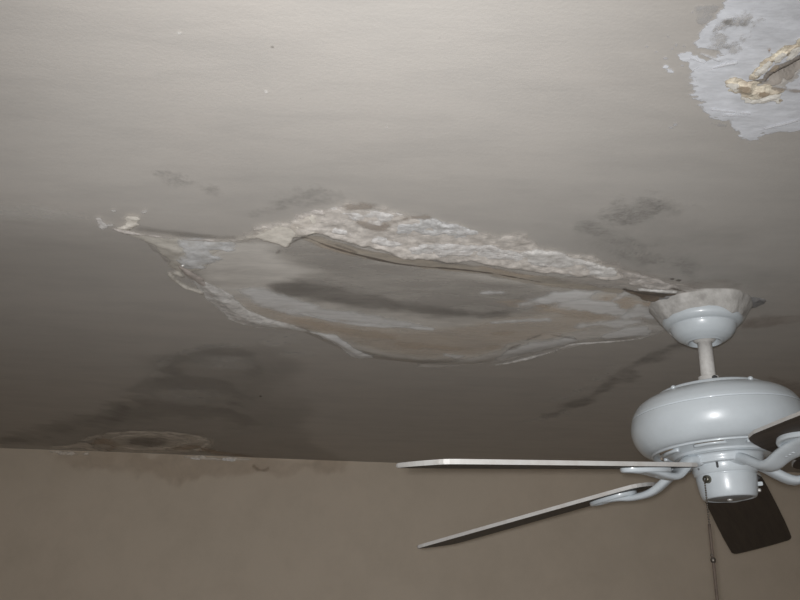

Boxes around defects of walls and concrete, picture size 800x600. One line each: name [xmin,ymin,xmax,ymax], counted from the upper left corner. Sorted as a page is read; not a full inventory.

spalling [725,38,800,104]
peeling [95,204,692,294]
water stain [168,265,434,359]
water stain [54,431,209,454]